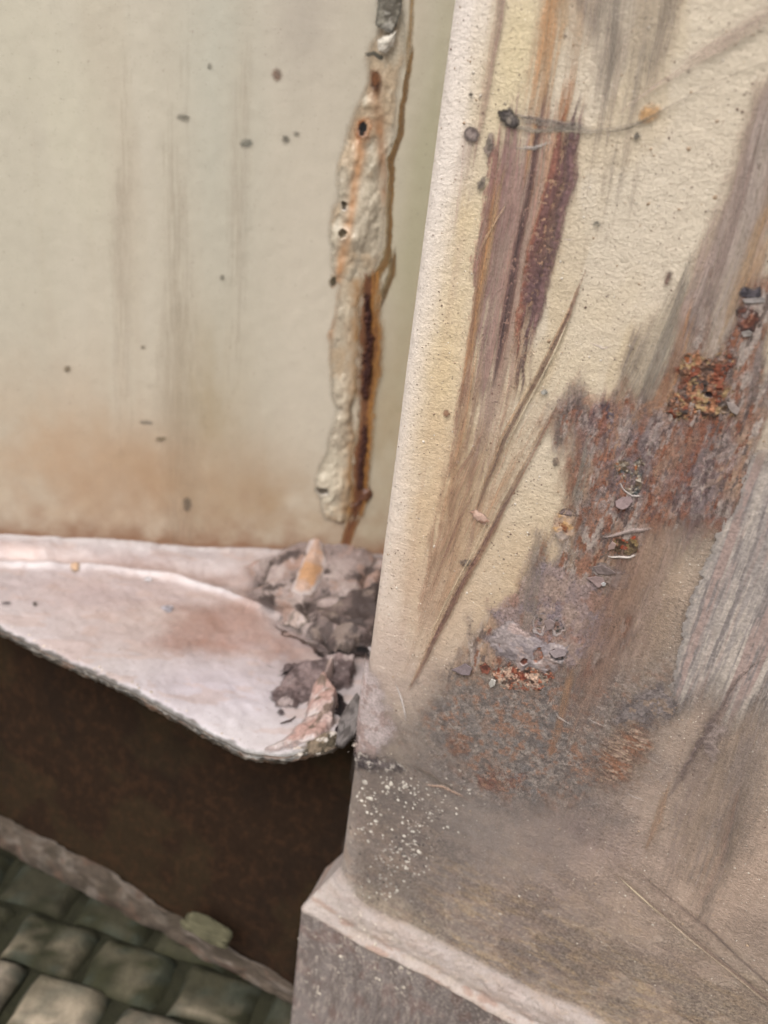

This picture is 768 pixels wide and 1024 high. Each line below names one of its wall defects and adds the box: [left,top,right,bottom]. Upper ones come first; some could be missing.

corrosion [341,0,414,545]
corrosion [444,0,582,511]
corrosion [423,80,768,813]
peeling [271,652,395,755]
efflorescence [349,769,473,902]